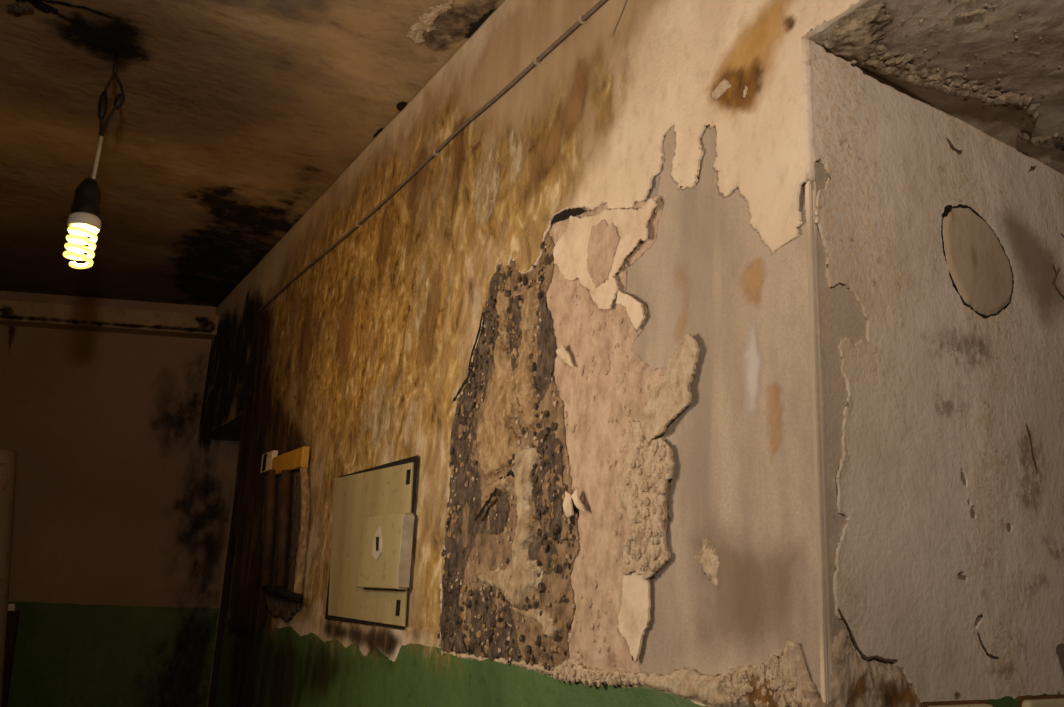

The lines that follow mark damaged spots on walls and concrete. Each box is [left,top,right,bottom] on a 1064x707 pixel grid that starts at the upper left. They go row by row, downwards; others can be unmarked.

flaking render [405,0,497,51]
rust [712,0,794,109]
flaking render [815,2,1064,151]
damp [164,0,655,649]
peeling [437,125,920,707]
damp [149,465,225,707]
peeling [1056,643,1064,673]